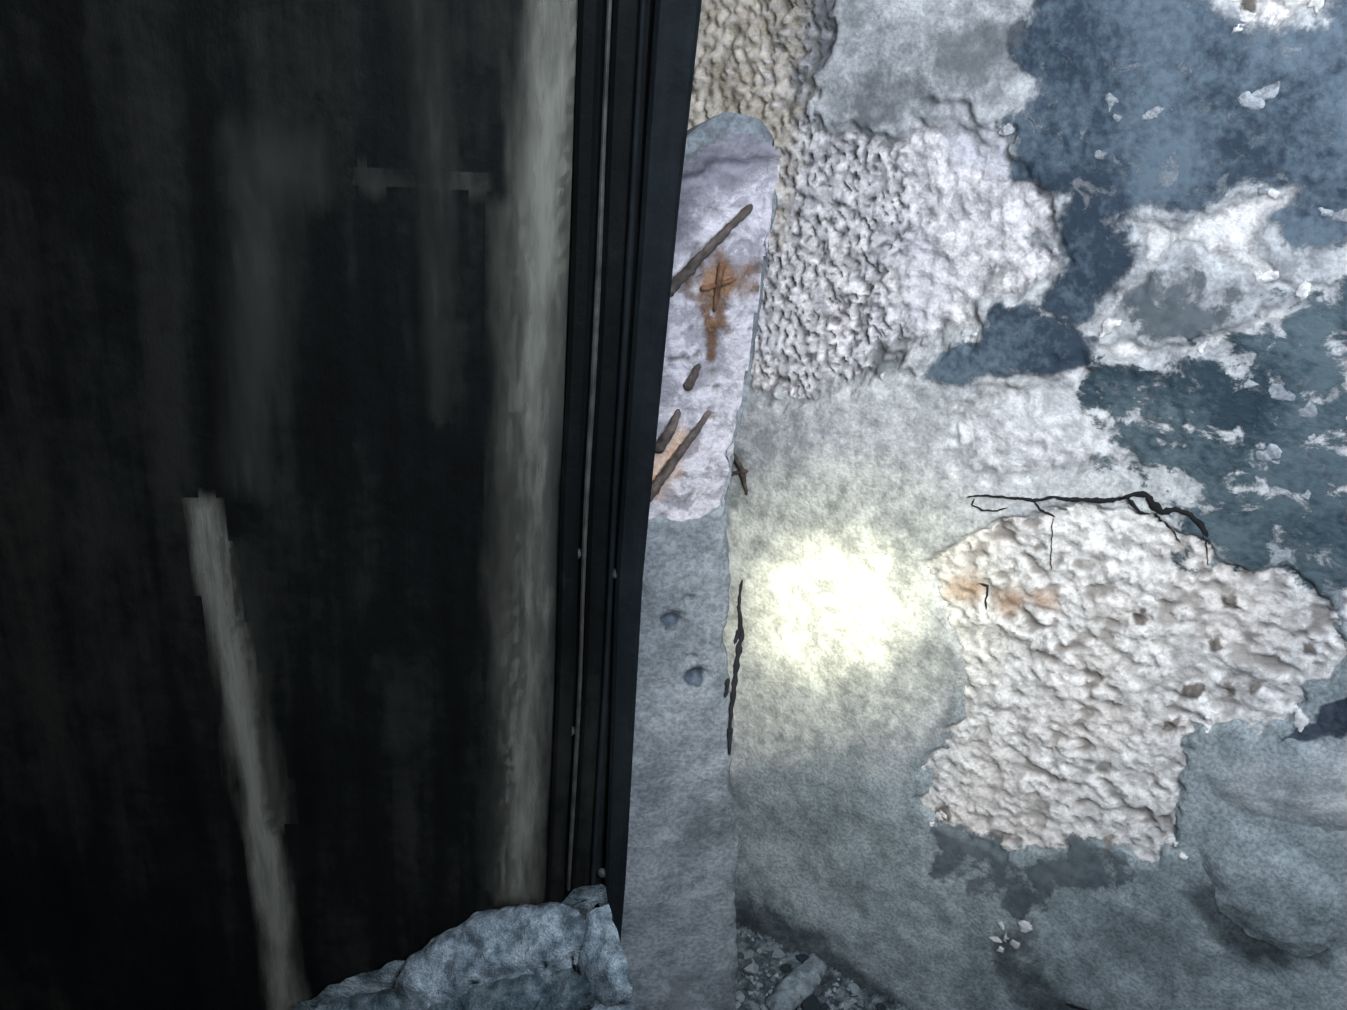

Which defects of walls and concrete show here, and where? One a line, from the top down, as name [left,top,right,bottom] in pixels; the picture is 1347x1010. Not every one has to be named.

spalling [1232,0,1325,32]
flaking render [1238,81,1280,110]
spalling [648,0,1060,522]
spalling [1144,185,1287,285]
flaking render [1317,207,1347,223]
rust [683,252,760,361]
spalling [1098,296,1141,358]
spalling [957,368,1173,474]
flaking render [1243,377,1318,442]
rust [652,447,678,482]
crack [967,491,1209,570]
spalling [918,501,1347,864]